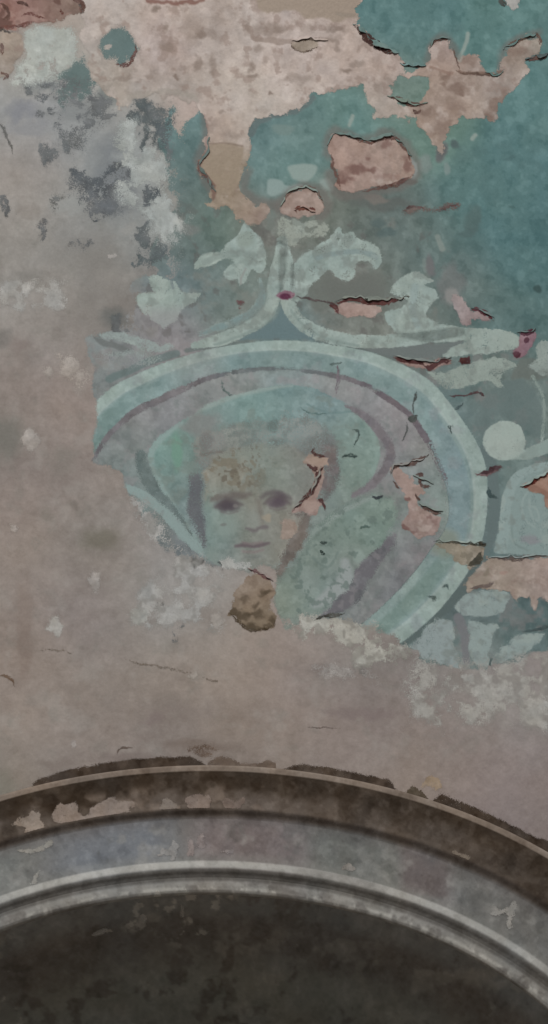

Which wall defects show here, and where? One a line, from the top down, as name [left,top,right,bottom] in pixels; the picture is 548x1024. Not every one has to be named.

damp [8,23,191,271]
peeling [0,0,548,227]
damp [0,194,11,217]
peeling [327,295,409,318]
peeling [451,294,494,327]
peeling [278,436,345,540]
peeling [389,454,548,611]
damp [287,610,548,741]
peeling [11,796,135,854]
peeling [159,794,245,810]
damp [33,743,548,852]